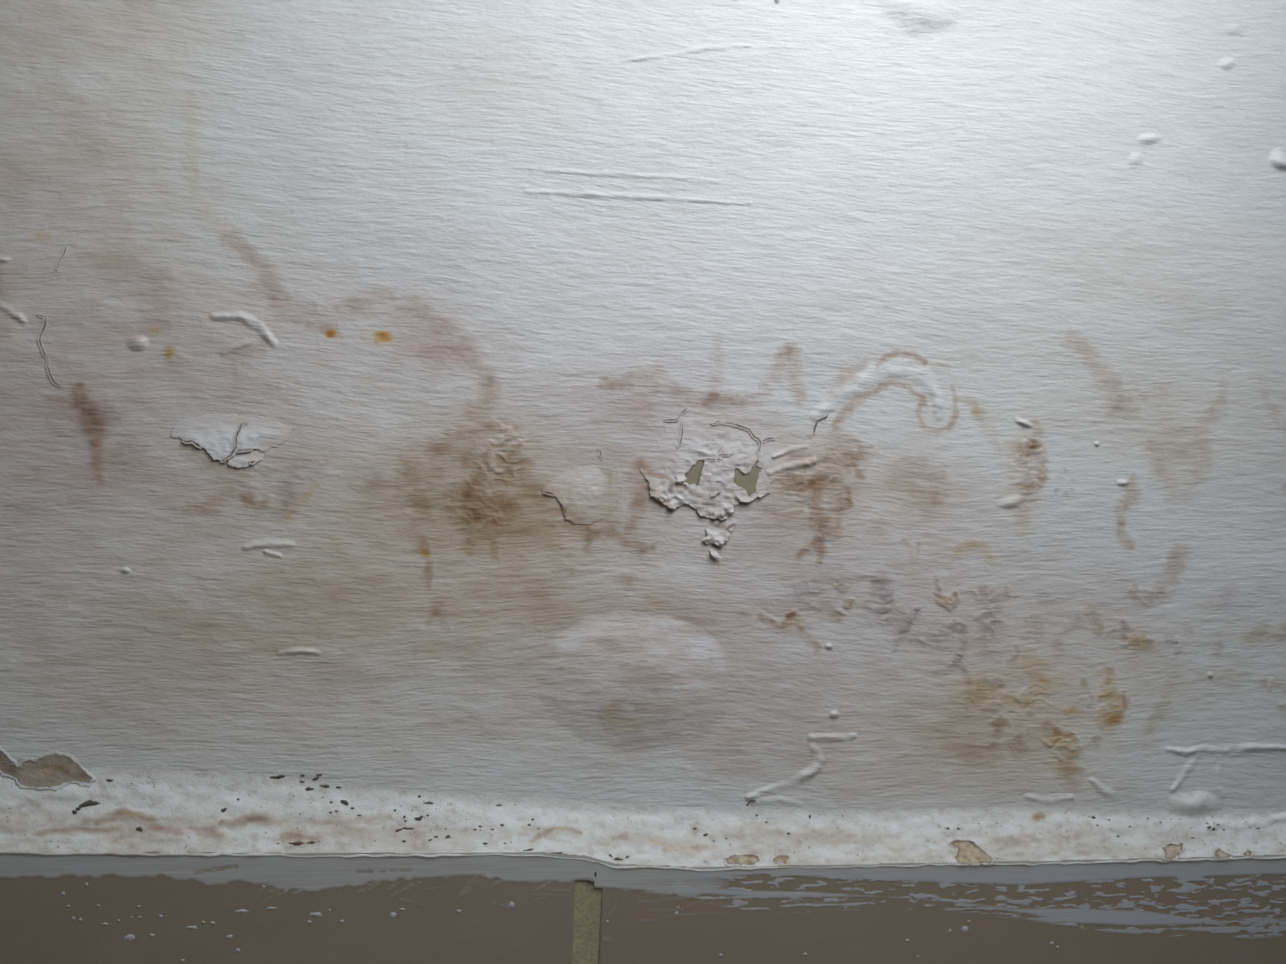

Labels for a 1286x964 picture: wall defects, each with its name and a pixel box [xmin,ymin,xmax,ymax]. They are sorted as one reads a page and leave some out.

water stain [0,228,189,361]
water stain [173,87,687,633]
water stain [41,378,151,489]
peeling [170,414,293,468]
peeling [639,413,786,559]
water stain [581,325,1286,794]
spalling [0,746,96,792]
water stain [32,824,138,837]
spalling [948,837,994,867]
spalling [1161,842,1185,861]